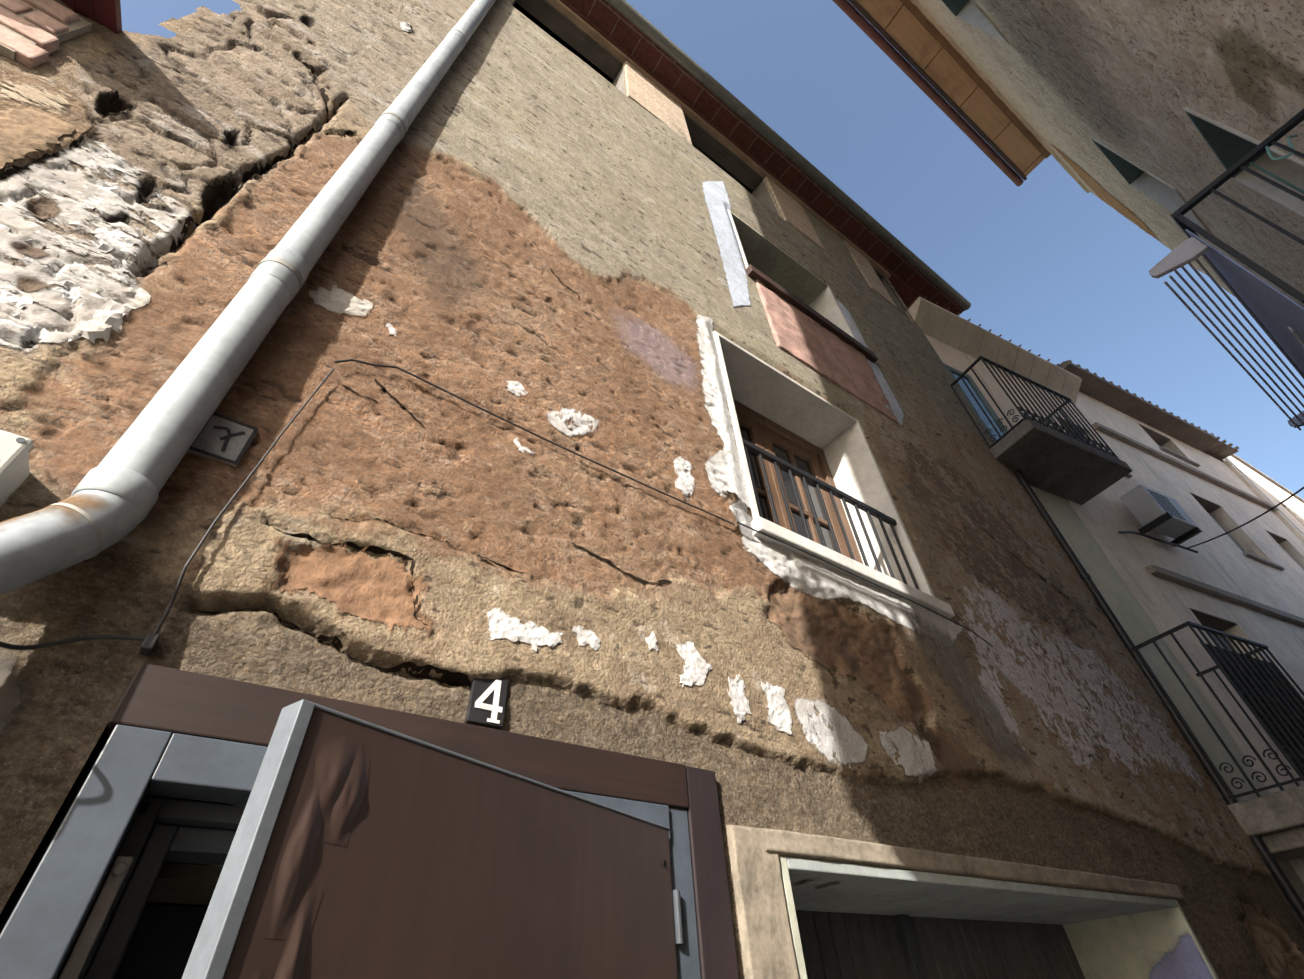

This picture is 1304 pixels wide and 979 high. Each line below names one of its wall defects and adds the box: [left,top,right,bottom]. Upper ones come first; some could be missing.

crack [0,126,94,180]
crack [145,62,355,276]
peeling [0,140,197,352]
peeling [309,285,373,317]
spalling [261,536,433,637]
crack [197,514,526,686]
peeling [487,607,601,652]
crack [567,541,671,585]
peeling [646,631,713,687]
peeling [673,298,1204,787]